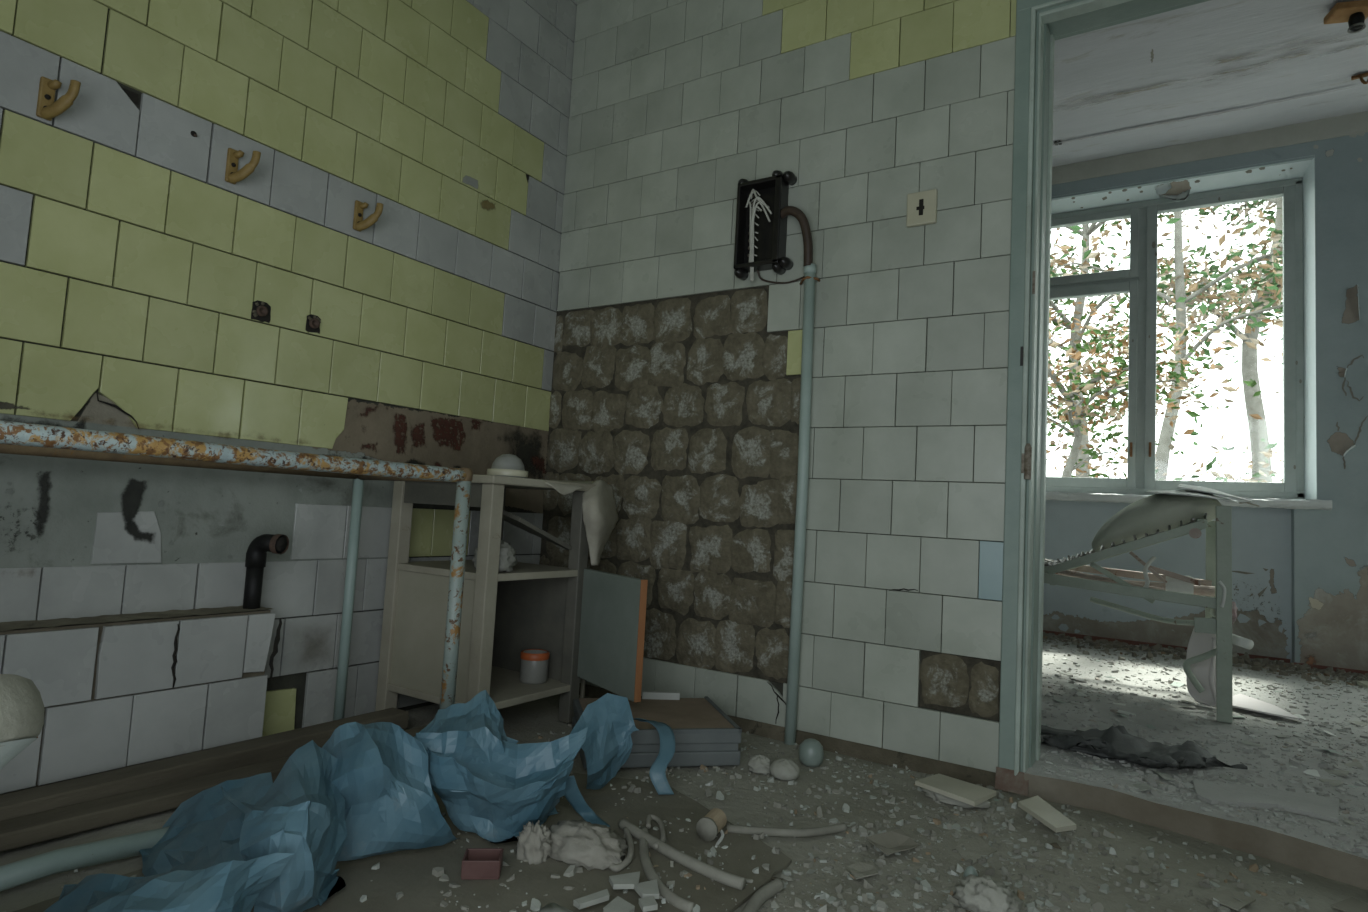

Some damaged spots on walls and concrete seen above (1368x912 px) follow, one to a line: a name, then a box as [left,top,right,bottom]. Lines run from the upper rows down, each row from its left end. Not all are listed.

spalling [122,88,139,104]
peeling [1342,284,1360,324]
peeling [1327,432,1356,456]
crack [1336,355,1368,469]
peeling [0,286,801,684]
peeling [1043,610,1205,647]
peeling [1232,557,1368,671]
peeling [919,651,1001,721]